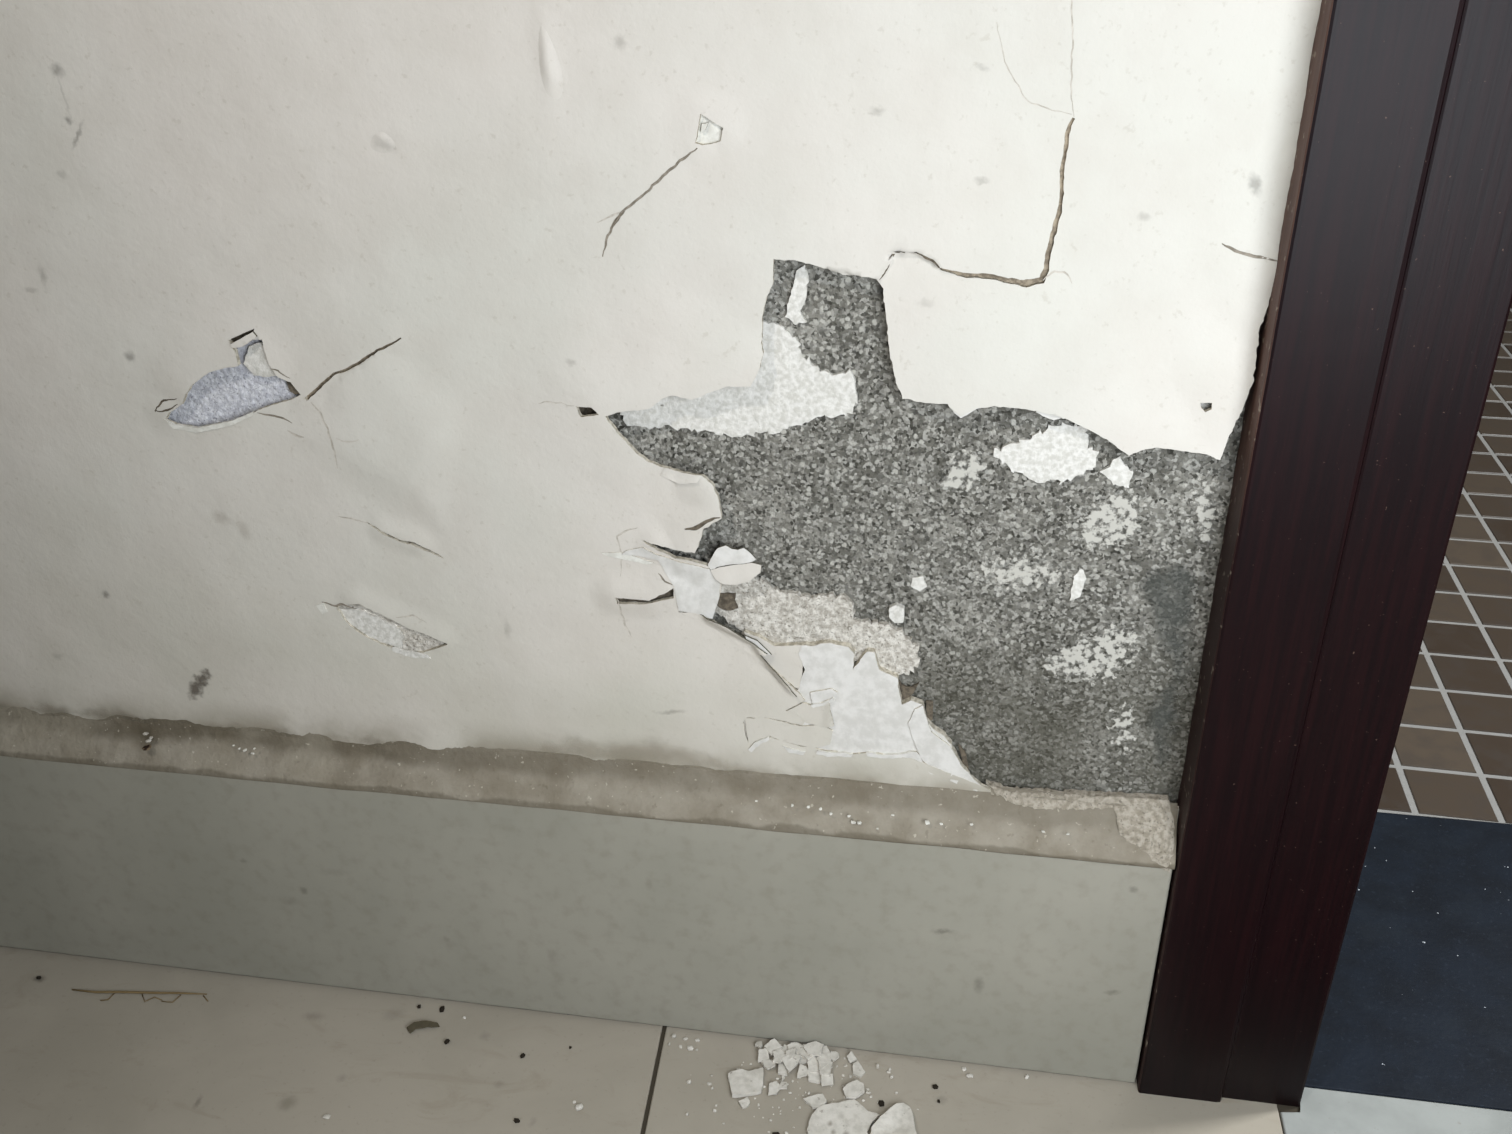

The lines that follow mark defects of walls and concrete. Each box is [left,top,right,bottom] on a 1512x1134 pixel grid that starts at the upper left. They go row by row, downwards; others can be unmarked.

crack [597,148,698,257]
crack [880,0,1075,286]
flaking render [154,329,300,433]
crack [259,338,401,469]
peeling [316,602,446,659]
flaking render [602,259,1247,873]